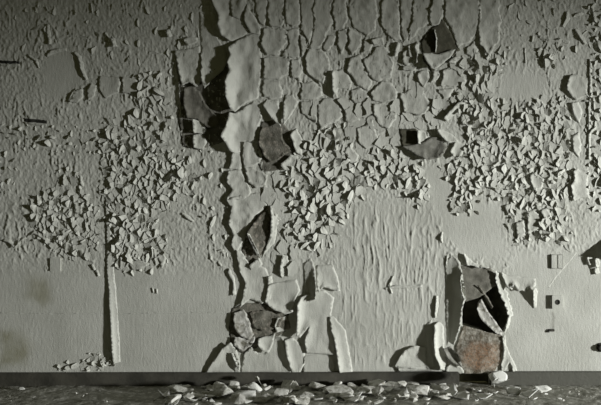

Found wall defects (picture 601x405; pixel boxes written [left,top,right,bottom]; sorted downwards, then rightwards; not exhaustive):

peeling [0,124,64,193]
peeling [27,0,431,373]
crack [254,0,502,166]
peeling [420,19,595,251]
peeling [583,0,601,82]
spalling [444,254,517,374]
peeling [587,256,600,275]